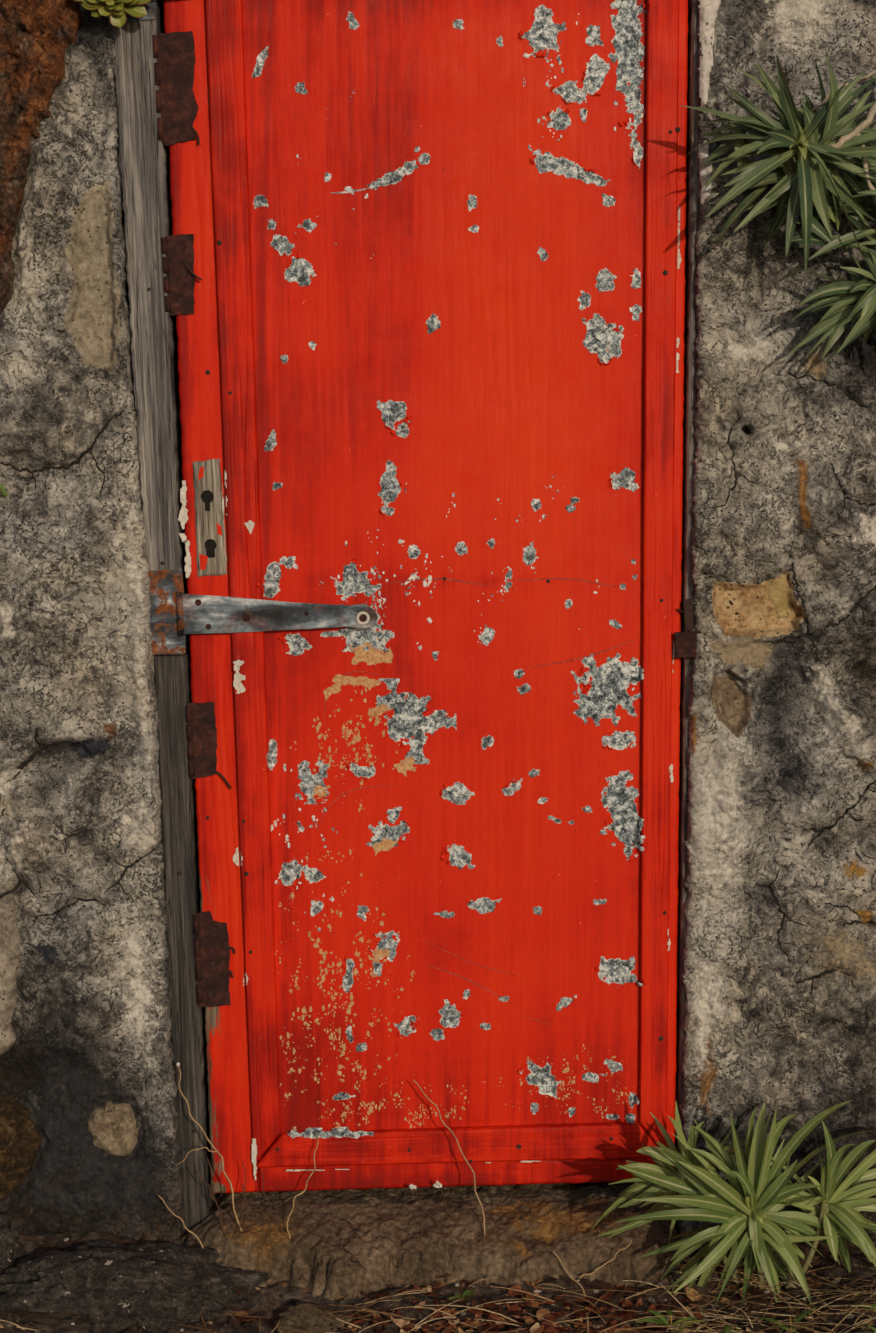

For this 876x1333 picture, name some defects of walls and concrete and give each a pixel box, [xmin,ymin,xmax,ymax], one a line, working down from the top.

peeling [496,5,567,59]
peeling [547,0,652,169]
peeling [577,268,642,366]
peeling [278,617,456,777]
peeling [571,652,644,750]
crack [0,728,159,929]
peeling [366,807,410,856]
peeling [537,770,645,862]
crack [803,780,876,850]
peeling [342,905,400,993]
crack [754,869,876,994]
peeling [395,989,470,1041]